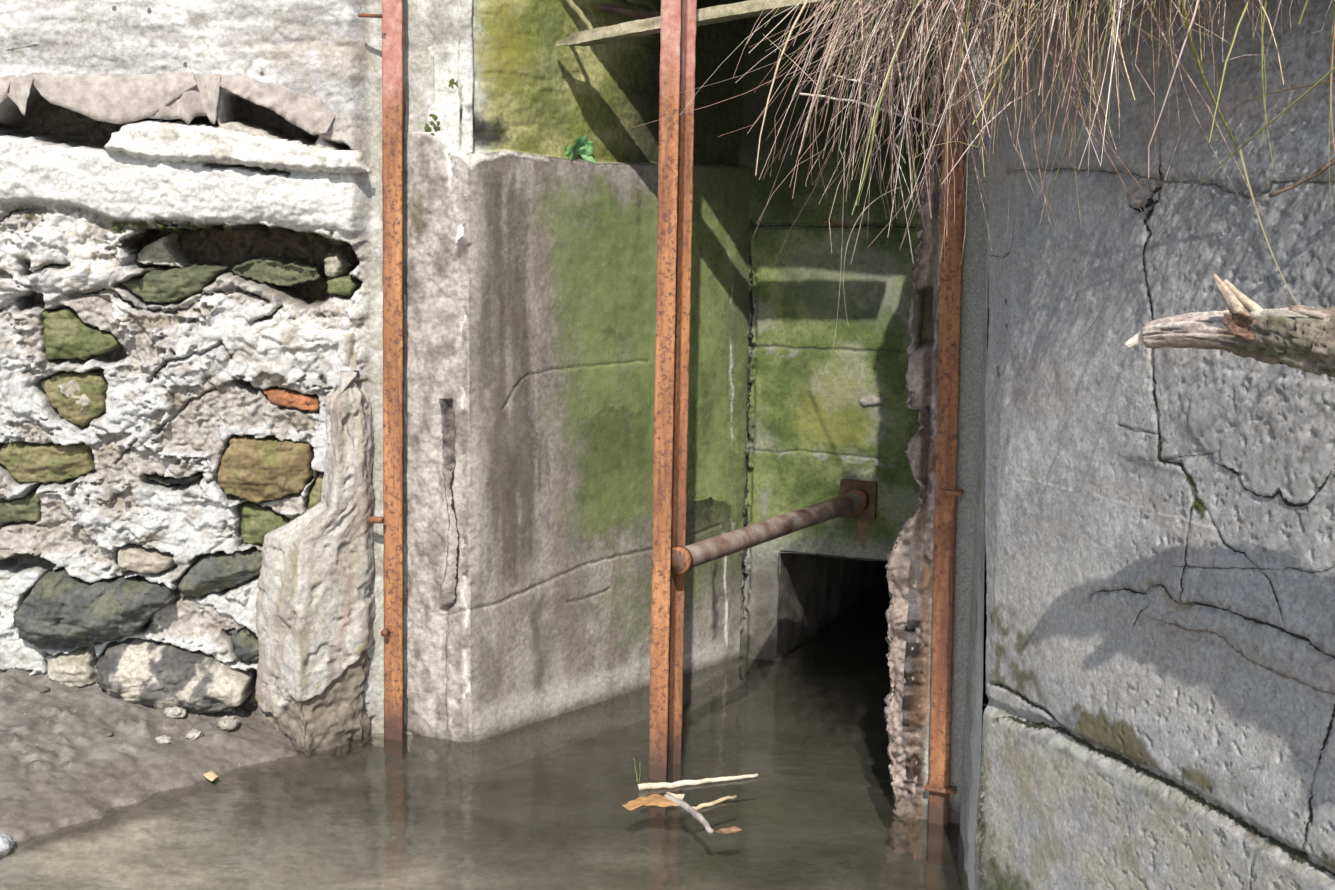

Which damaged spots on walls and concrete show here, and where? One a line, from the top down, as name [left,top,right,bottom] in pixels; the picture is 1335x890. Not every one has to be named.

flaking render [0,62,372,175]
spalling [121,225,360,303]
crack [1020,148,1335,321]
leakage [484,189,542,571]
leakage [813,453,883,465]
spalling [261,651,372,743]
leakage [712,556,728,646]
spalling [891,541,925,798]
leakage [991,609,1040,696]
leakage [1073,703,1156,767]
crack [991,367,1335,890]
leakage [1183,770,1213,792]